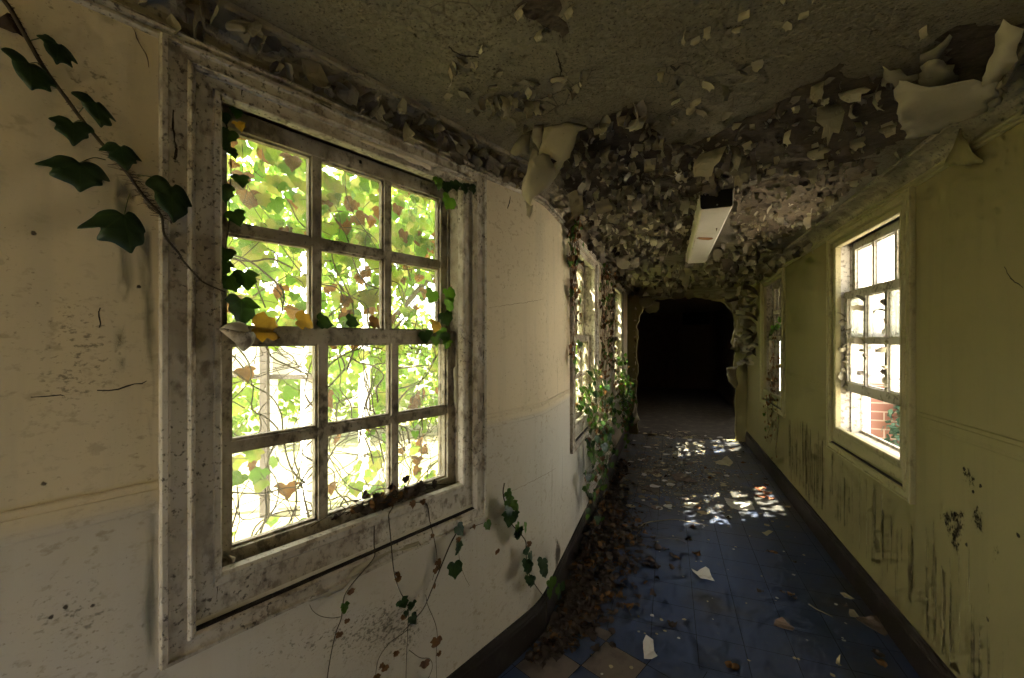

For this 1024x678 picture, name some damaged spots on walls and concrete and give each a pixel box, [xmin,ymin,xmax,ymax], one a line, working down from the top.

peeling [166,0,1024,425]
crack [97,381,146,391]
water stain [942,506,982,550]